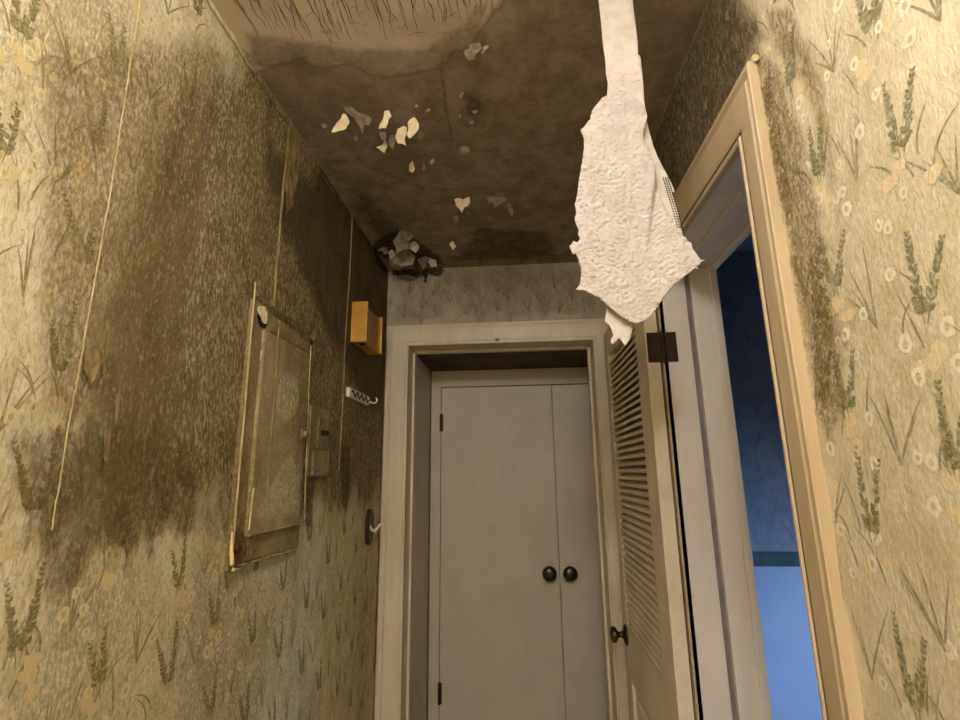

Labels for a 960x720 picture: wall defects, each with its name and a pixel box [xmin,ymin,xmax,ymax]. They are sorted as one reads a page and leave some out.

peeling [464,42,490,60]
peeling [321,105,431,153]
peeling [453,197,470,223]
damp [633,0,839,432]
peeling [377,231,437,275]
damp [19,0,608,585]